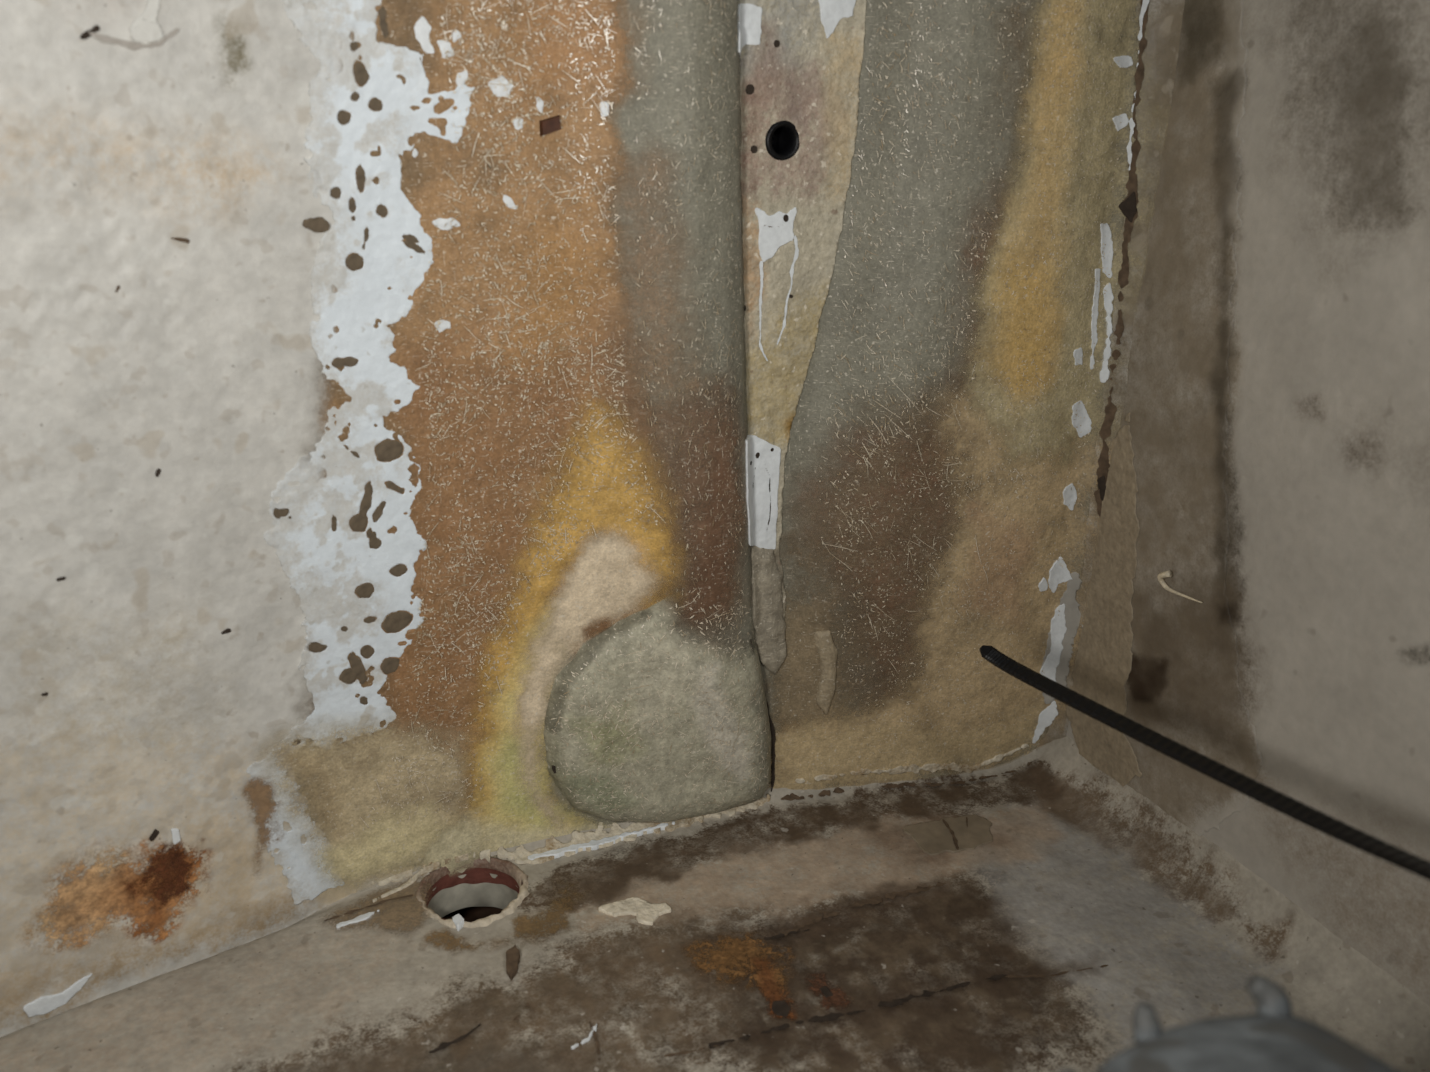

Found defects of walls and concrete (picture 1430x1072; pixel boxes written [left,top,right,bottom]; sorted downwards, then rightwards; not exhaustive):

peeling [246,0,1142,905]
water stain [272,0,1146,951]
crack [1094,0,1149,517]
corrosion [27,828,209,949]
corrosion [684,932,796,1019]